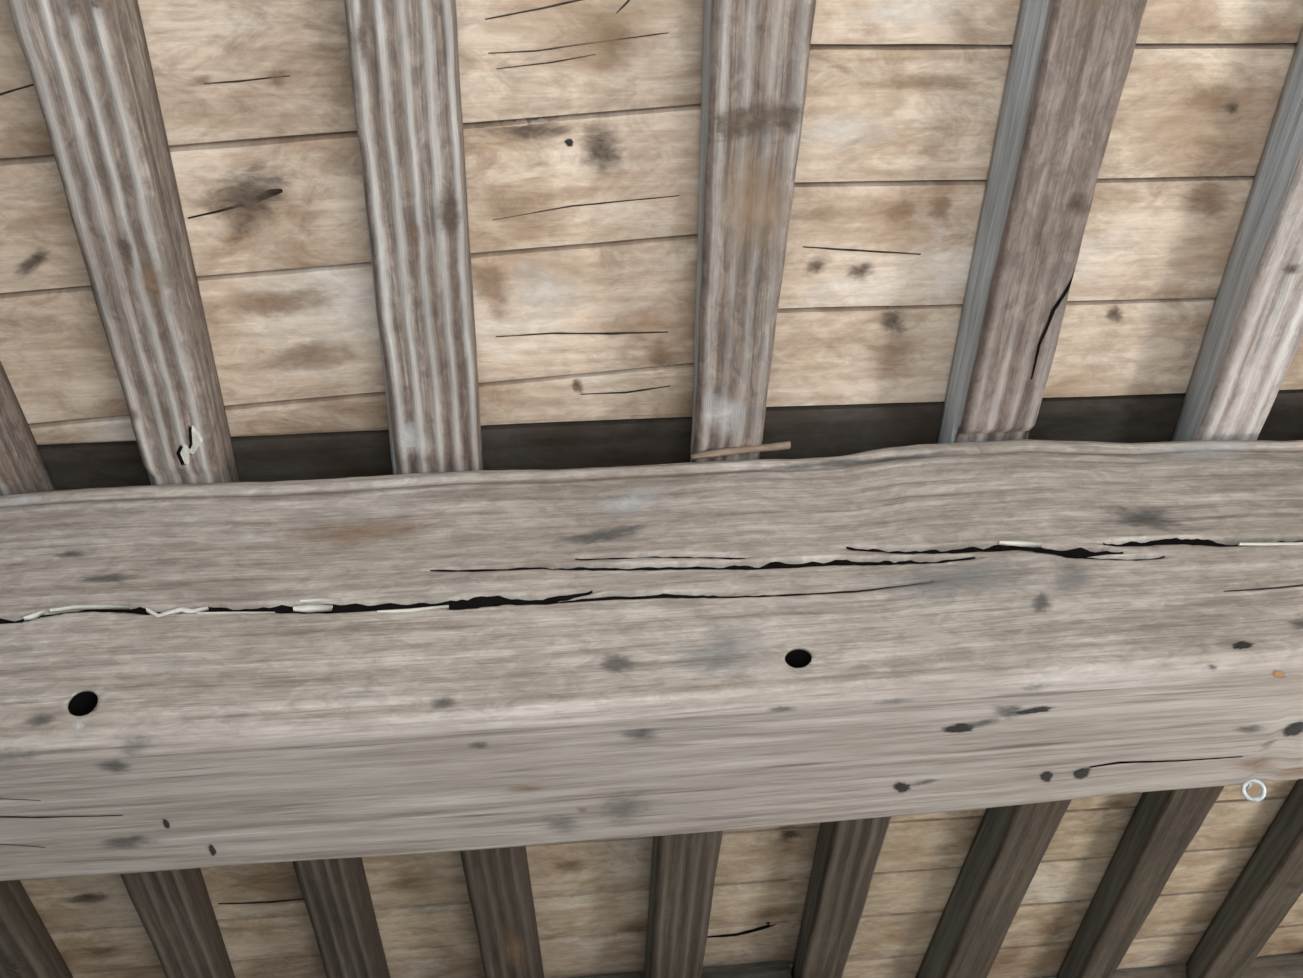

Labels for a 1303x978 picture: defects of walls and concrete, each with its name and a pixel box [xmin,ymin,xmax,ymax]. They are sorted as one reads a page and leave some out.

crack [485,0,668,69]
crack [1031,271,1075,379]
crack [0,538,1303,624]